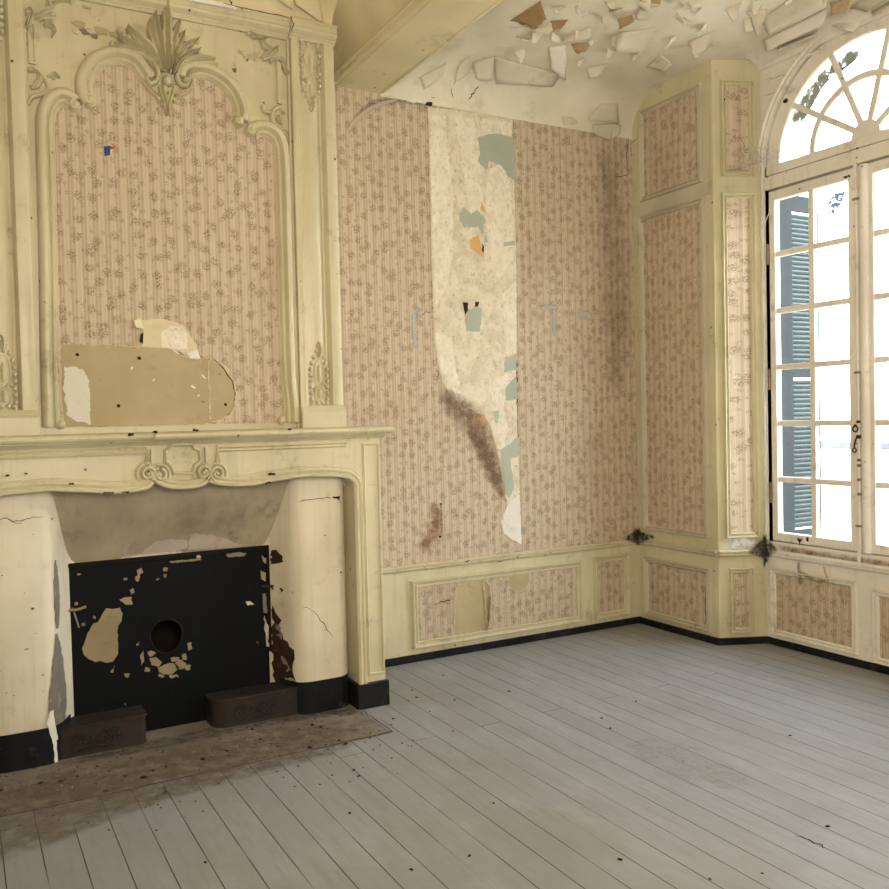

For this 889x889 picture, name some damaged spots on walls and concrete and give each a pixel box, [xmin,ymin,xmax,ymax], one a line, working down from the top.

peeling [454,0,701,87]
peeling [725,0,889,52]
flaking render [384,95,520,505]
flaking render [61,344,235,436]
damp [445,393,504,496]
flaking render [76,533,253,580]
flaking render [47,560,67,762]
peeling [82,568,143,678]
peeling [136,641,192,678]